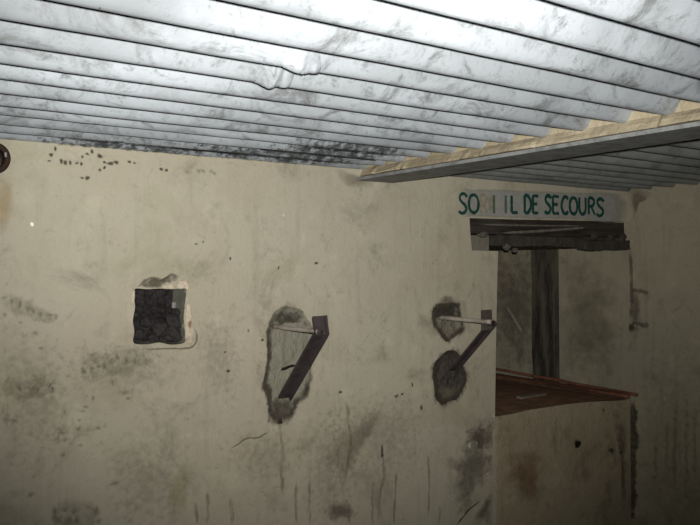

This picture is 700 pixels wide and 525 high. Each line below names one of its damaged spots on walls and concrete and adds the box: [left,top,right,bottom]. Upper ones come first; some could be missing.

leakage [48,137,203,171]
leakage [212,138,398,165]
spalling [162,280,194,344]
flaking render [261,307,313,422]
flaking render [432,298,467,405]